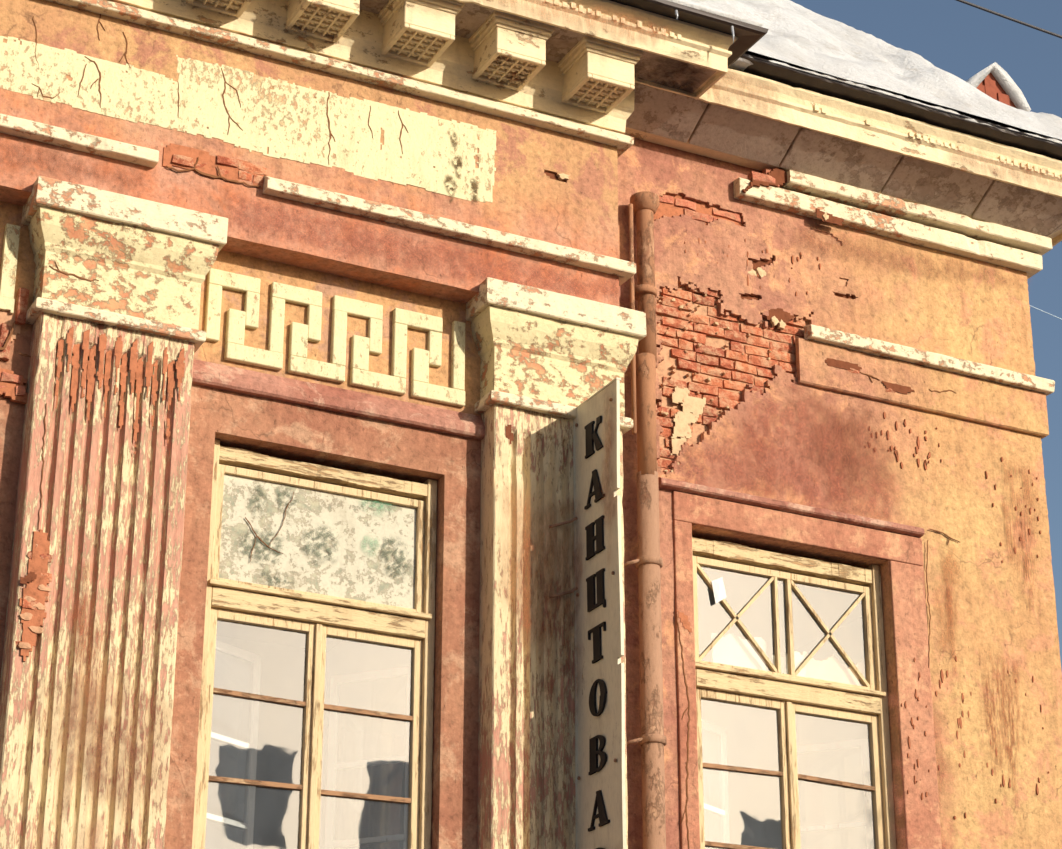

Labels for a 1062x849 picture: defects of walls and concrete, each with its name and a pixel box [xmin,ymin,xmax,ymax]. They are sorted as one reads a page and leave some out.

crack [32,14,130,108]
crack [166,157,261,187]
crack [221,68,243,135]
peeling [0,36,496,203]
crack [326,92,336,163]
crack [398,110,408,154]
spalling [741,238,774,300]
spalling [0,288,29,405]
peeling [55,327,185,454]
spalling [656,286,808,474]
crack [245,492,294,563]
spalling [13,529,52,662]